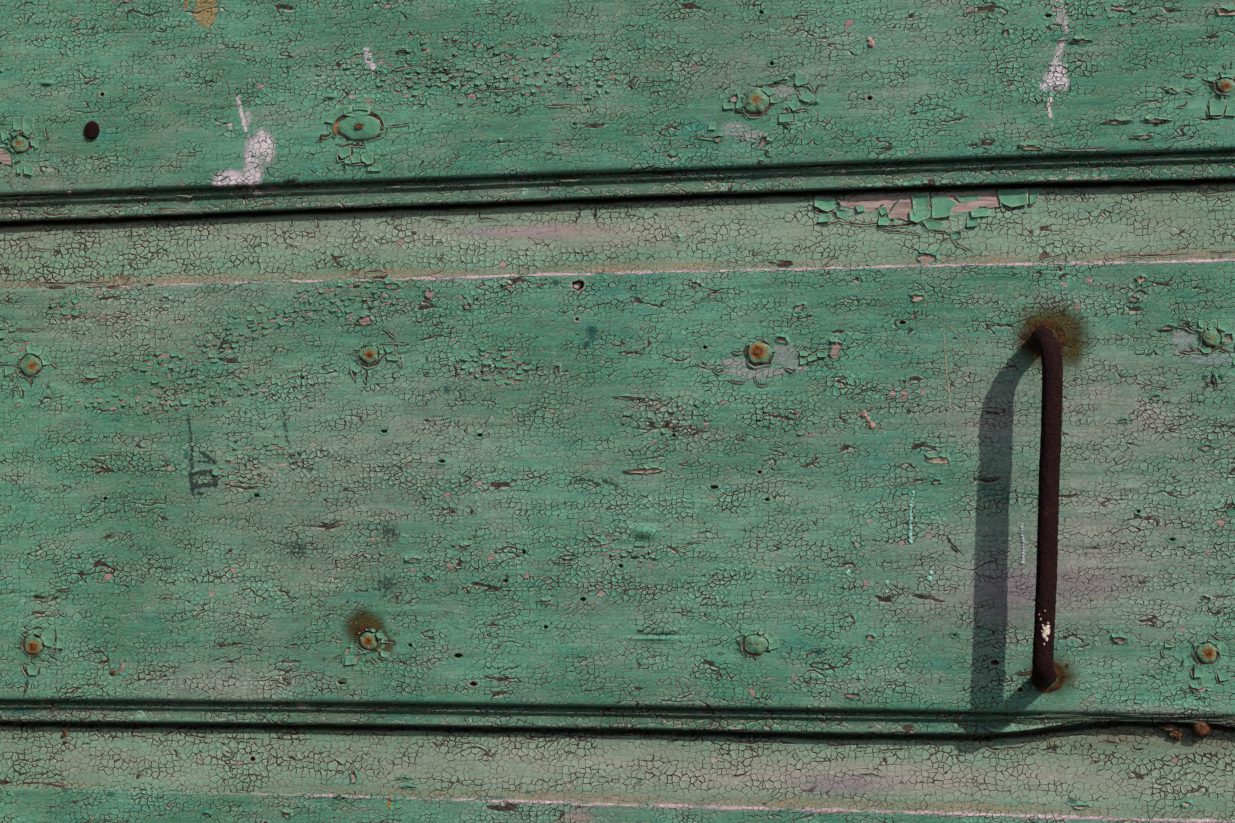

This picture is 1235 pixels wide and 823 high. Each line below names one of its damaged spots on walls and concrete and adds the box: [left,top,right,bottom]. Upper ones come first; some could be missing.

crack [1053,147,1167,159]
crack [0,193,194,252]
peeling [810,173,1117,268]
crack [768,259,793,267]
crack [1104,251,1235,262]
crack [26,279,154,289]
rust [1021,309,1083,362]
peeling [0,322,58,409]
crack [946,535,979,576]
rust [348,613,391,654]
rust [1031,661,1069,693]
crack [0,758,66,787]